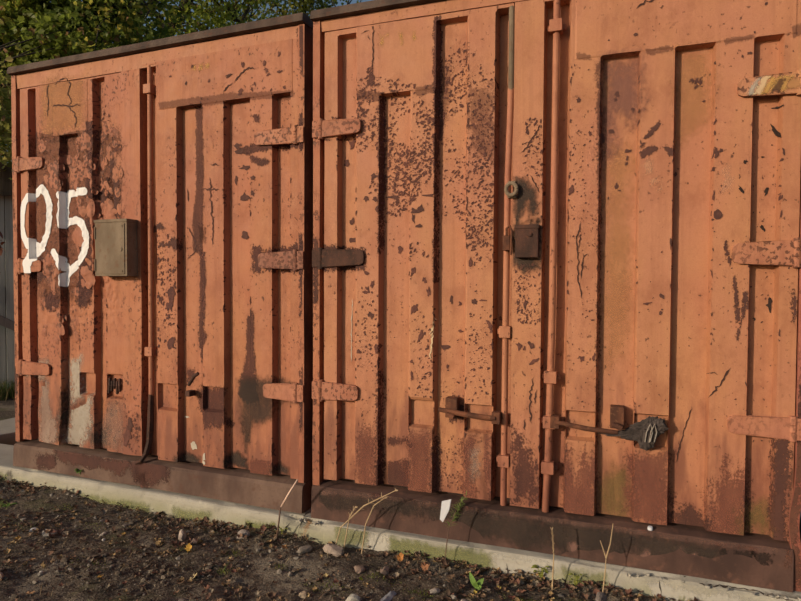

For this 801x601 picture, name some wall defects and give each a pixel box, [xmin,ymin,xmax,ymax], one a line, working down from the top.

peeling [27,97,122,181]
rust [234,142,303,185]
rust [363,96,398,254]
rust [402,15,445,283]
rust [159,104,207,382]
rust [241,231,303,316]
rust [732,276,749,341]
rust [238,308,257,399]
water stain [65,357,92,445]
rust [197,386,235,430]
rust [510,421,543,509]
crack [684,576,793,601]